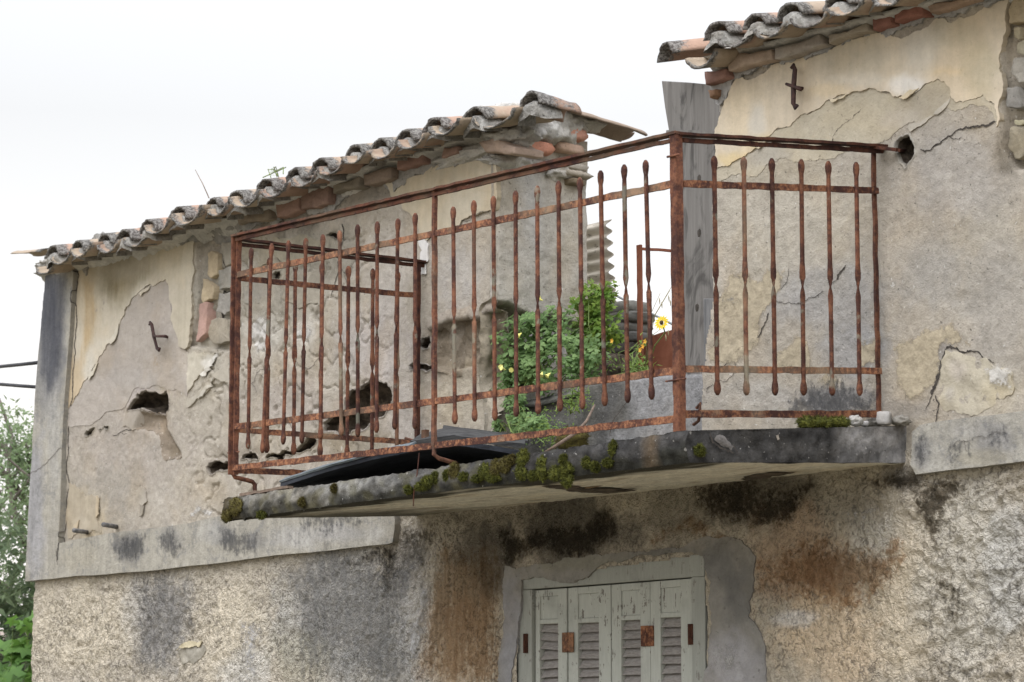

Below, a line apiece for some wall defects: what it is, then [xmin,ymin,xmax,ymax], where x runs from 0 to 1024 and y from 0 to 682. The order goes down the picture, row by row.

peeling [717,79,997,181]
crack [920,121,997,152]
peeling [68,280,230,438]
corrosion [643,330,673,370]
peeling [894,323,970,399]
crack [926,345,994,422]
peeling [984,365,1011,388]
peeling [66,482,102,539]